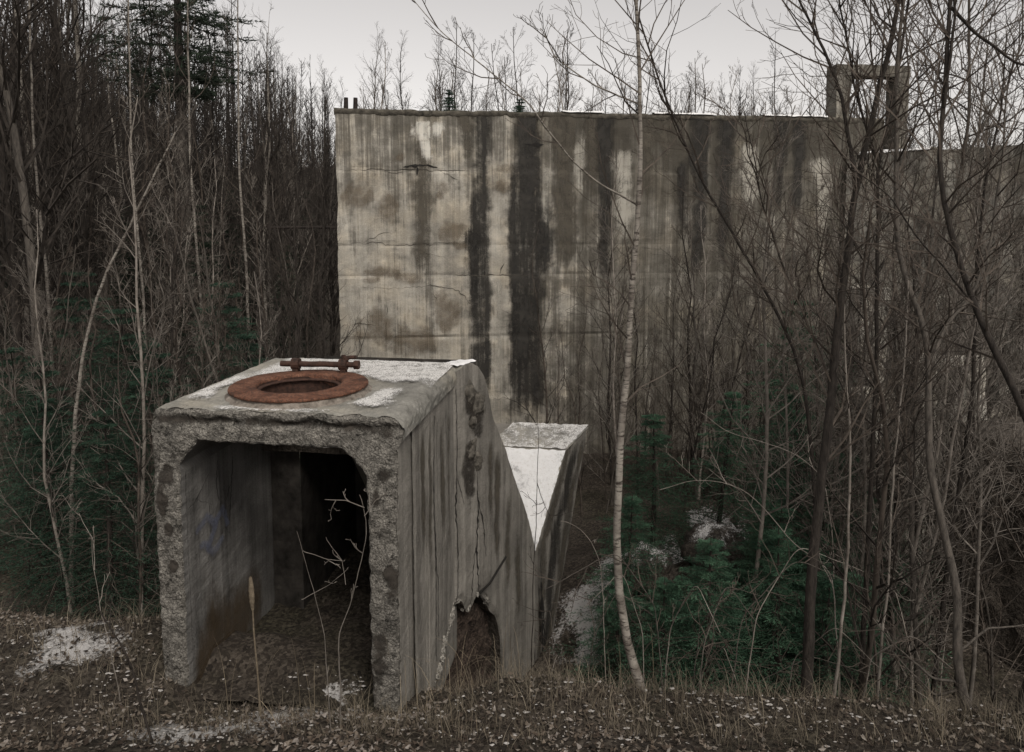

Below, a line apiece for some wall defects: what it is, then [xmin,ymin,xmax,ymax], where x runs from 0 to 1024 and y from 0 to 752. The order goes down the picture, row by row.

crack [341,168,477,181]
damp [371,116,758,496]
crack [411,404,486,680]
spalling [433,592,490,690]